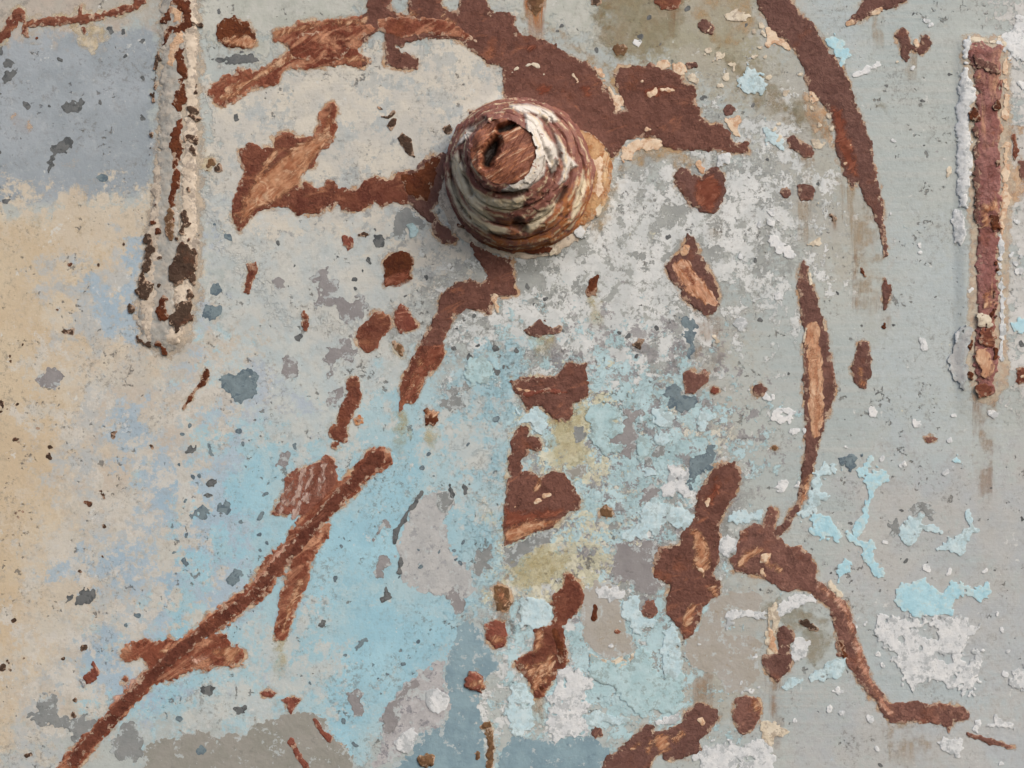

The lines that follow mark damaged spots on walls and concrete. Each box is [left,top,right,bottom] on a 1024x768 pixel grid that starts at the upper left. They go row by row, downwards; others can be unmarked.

corrosion [127,0,751,333]
corrosion [757,0,889,258]
corrosion [230,100,553,426]
peeling [679,316,699,359]
corrosion [502,361,589,546]
corrosion [512,572,598,701]
peeling [371,383,816,768]
corrosion [641,260,970,734]
peeling [782,658,846,695]
peeling [775,454,907,598]
peeling [874,569,996,697]
peeling [887,502,989,563]